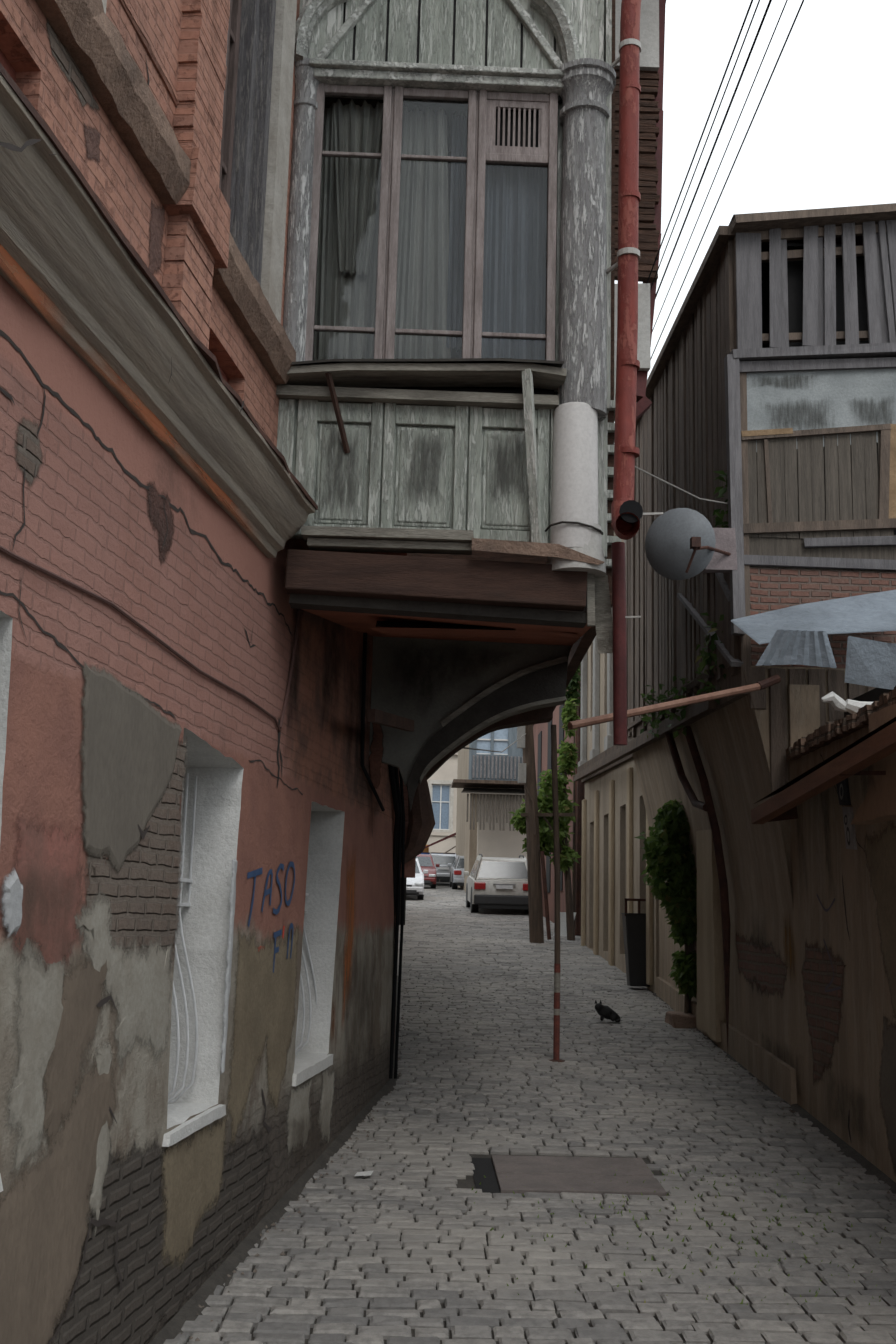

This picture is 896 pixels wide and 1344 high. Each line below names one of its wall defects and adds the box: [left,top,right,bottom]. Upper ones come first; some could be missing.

spalling [14,418,43,486]
crack [0,330,292,648]
spalling [147,482,175,564]
leakage [326,434,356,506]
leakage [495,441,520,491]
crack [0,588,84,668]
crack [126,687,176,719]
crack [249,719,303,795]
flaking render [0,739,188,1344]